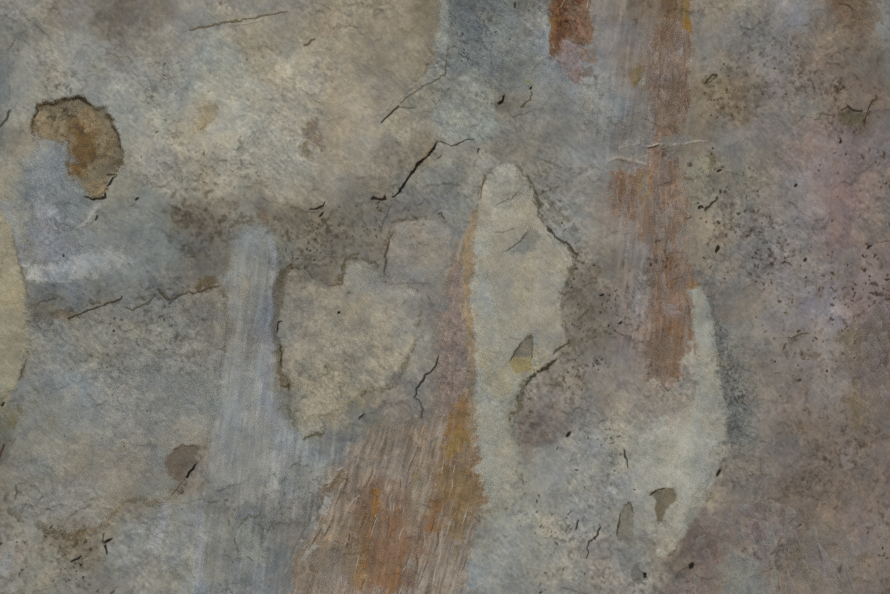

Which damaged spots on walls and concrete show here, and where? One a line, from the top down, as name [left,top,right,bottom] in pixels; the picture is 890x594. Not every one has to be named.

corrosion [549,0,596,83]
crack [381,60,447,123]
flaking render [30,95,124,200]
crack [371,139,479,200]
corrosion [609,0,696,392]
crack [38,281,218,319]
flaking render [510,335,533,373]
corrosion [281,208,487,594]
crack [414,356,439,418]
flaking render [164,440,200,481]
flaking render [617,501,634,546]
flaking render [650,488,676,522]